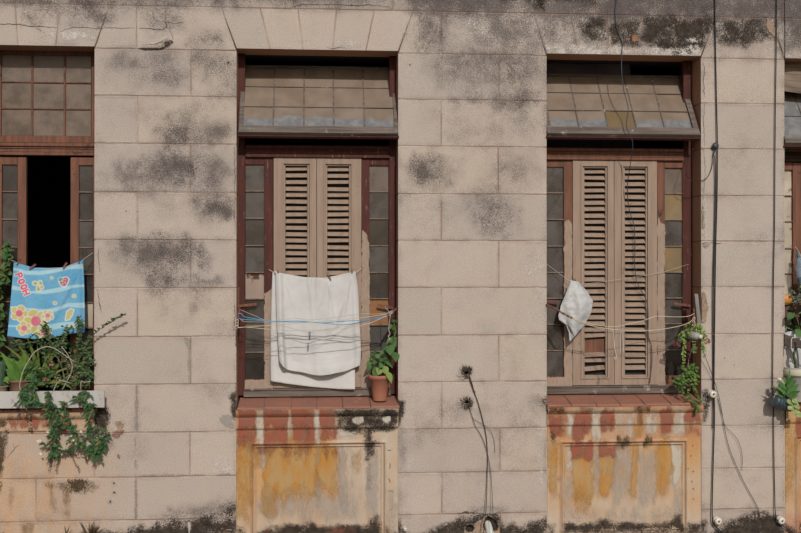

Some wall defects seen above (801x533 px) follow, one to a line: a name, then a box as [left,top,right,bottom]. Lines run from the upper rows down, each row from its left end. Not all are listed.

damp [545,0,770,56]
damp [121,237,188,266]
damp [94,407,110,433]
damp [542,396,575,435]
damp [590,408,601,442]
damp [0,420,9,472]
damp [256,399,404,533]
damp [671,410,685,486]
damp [61,478,92,493]
damp [103,505,243,533]
flaking render [464,506,503,533]
damp [429,497,801,533]